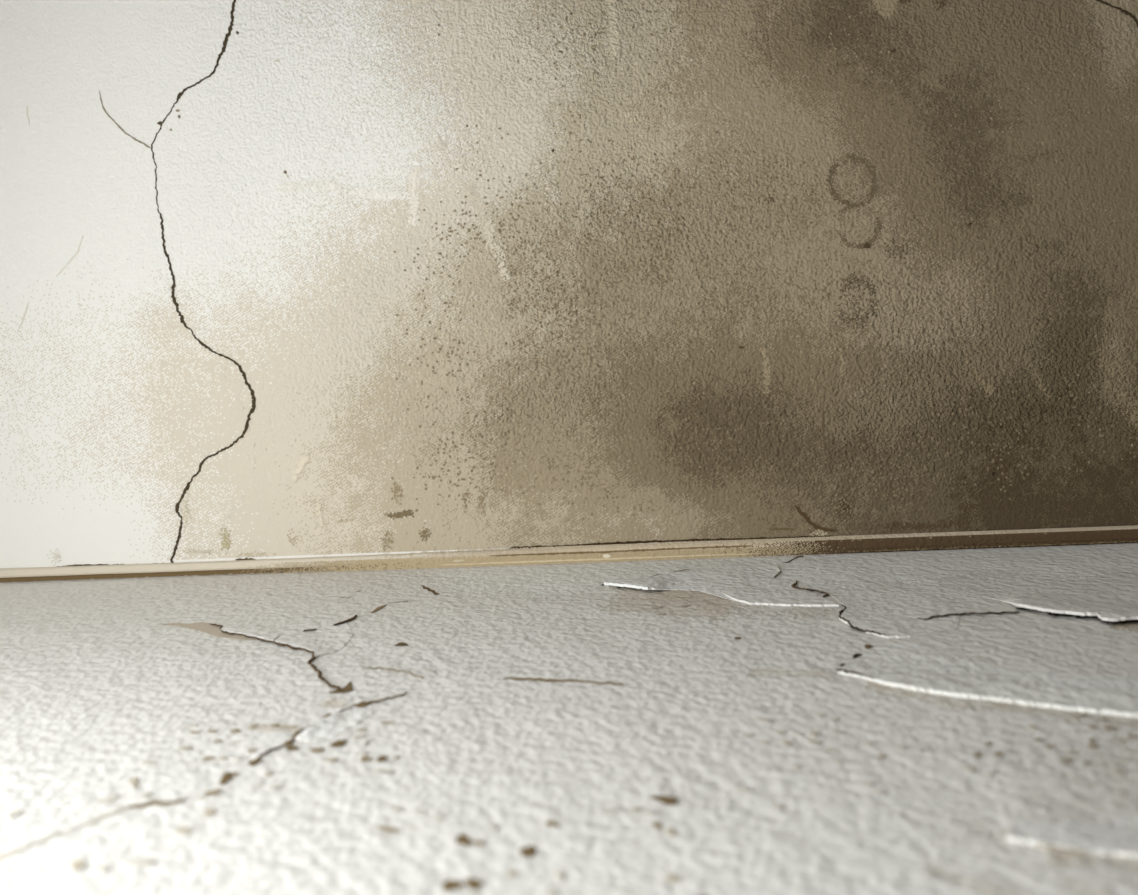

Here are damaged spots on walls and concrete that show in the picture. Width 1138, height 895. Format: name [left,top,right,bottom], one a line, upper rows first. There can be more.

crack [1096,0,1138,27]
crack [99,0,256,563]
water stain [0,0,1138,625]
crack [57,561,122,569]
crack [493,505,889,636]
crack [390,585,439,603]
spalling [163,622,256,640]
crack [919,607,1138,624]
crack [209,596,437,712]
spalling [329,681,369,707]
crack [258,725,312,758]
crack [0,799,186,859]